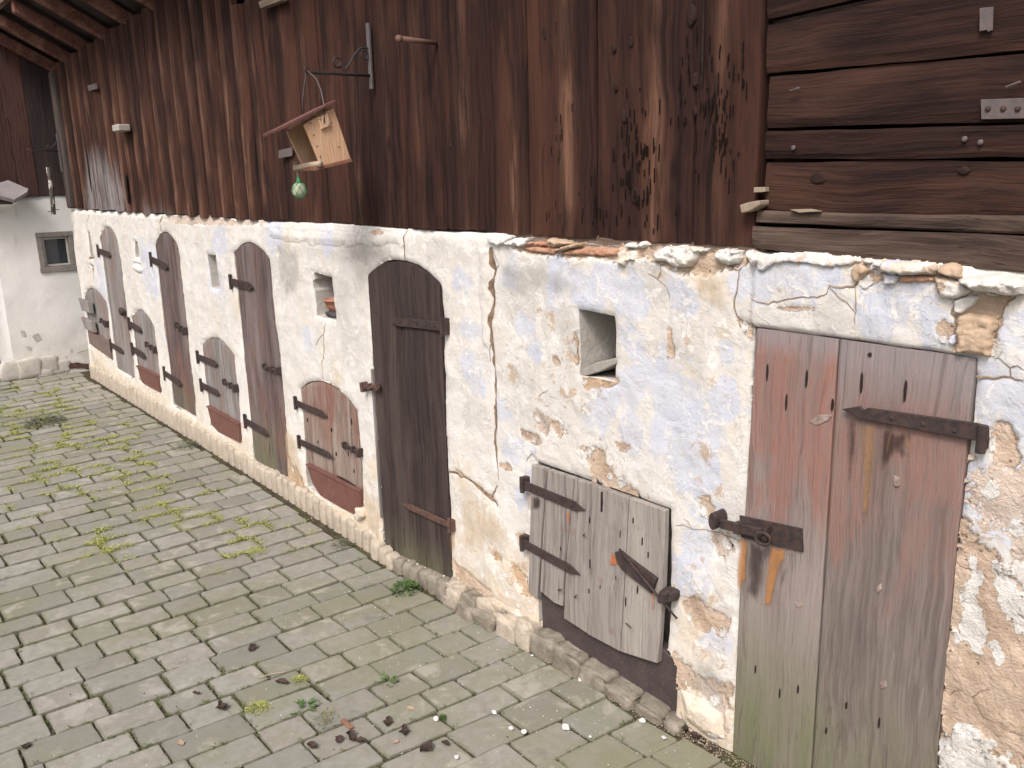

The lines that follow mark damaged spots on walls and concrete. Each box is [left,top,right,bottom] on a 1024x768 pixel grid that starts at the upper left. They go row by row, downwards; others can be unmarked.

spalling [512,241,757,277]
crack [731,250,1024,381]
spalling [935,293,1010,358]
crack [448,247,499,507]
spalling [577,438,639,497]
corrosion [738,540,784,604]
spalling [936,420,1024,768]